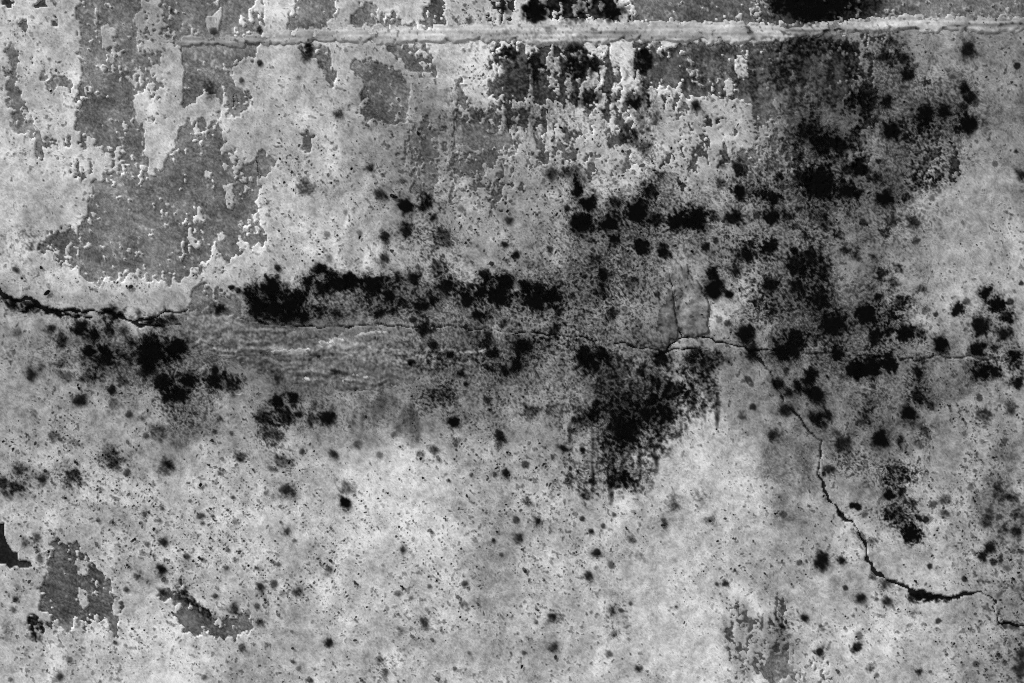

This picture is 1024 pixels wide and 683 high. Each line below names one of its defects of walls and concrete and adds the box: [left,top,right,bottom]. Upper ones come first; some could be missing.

peeling [351,0,446,30]
peeling [1,0,277,319]
peeling [351,33,961,212]
crack [0,288,188,328]
water stain [1,296,241,407]
water stain [228,0,984,545]
water stain [951,285,1024,424]
crack [223,311,1024,627]
spalling [0,523,32,569]
peeling [28,538,125,643]
peeling [157,579,254,642]
water stain [850,632,862,652]